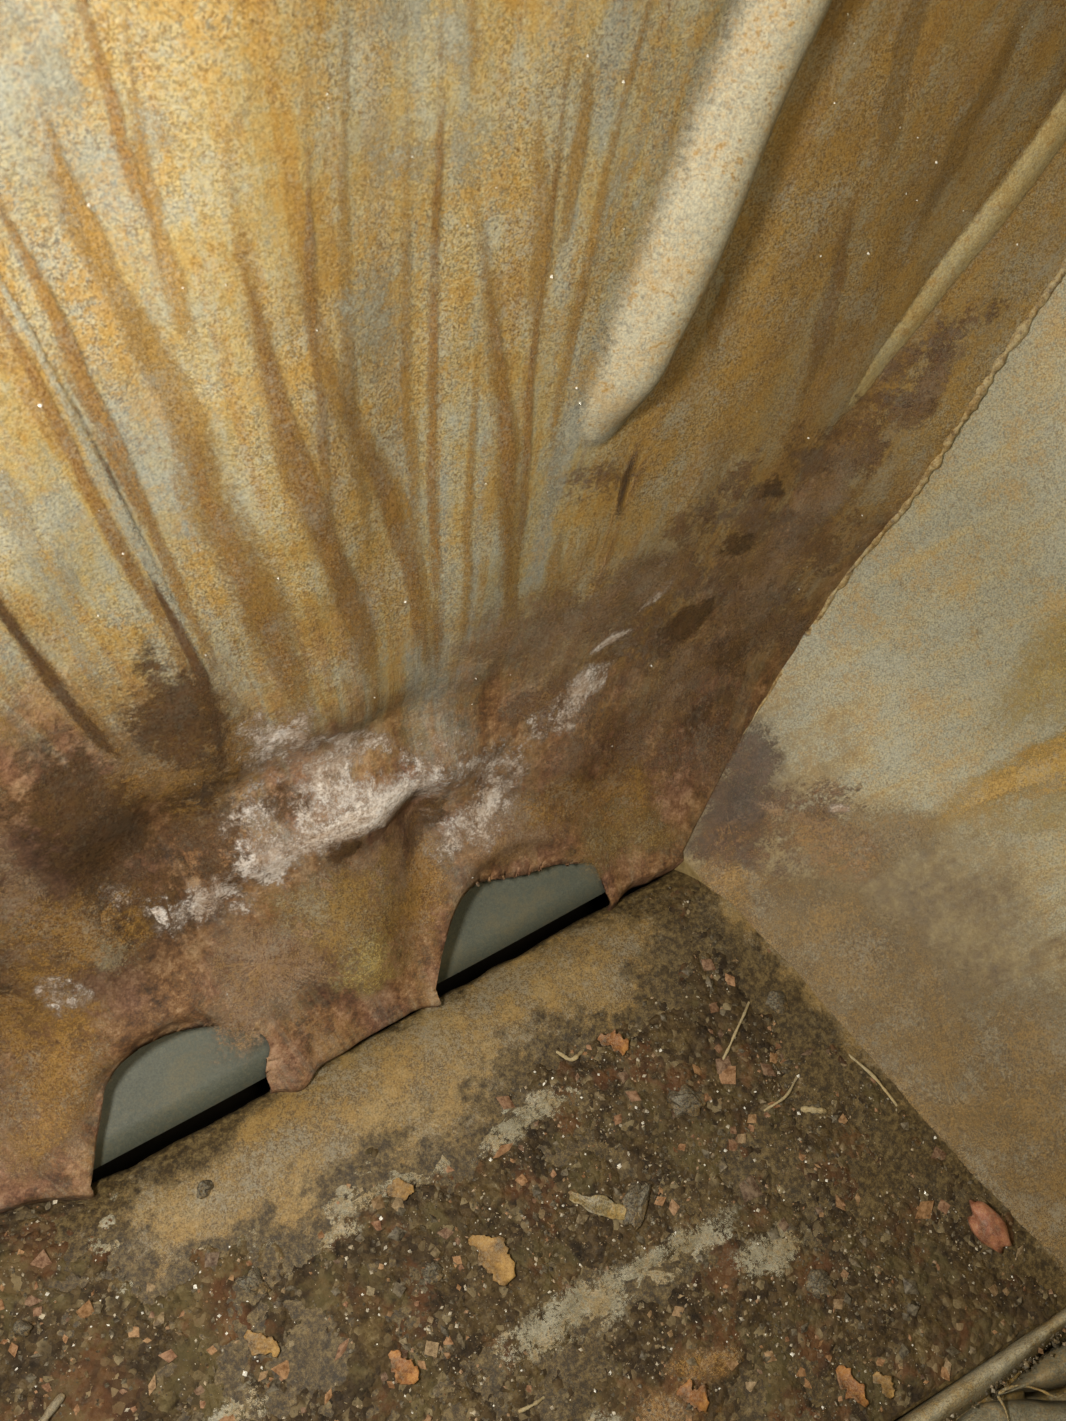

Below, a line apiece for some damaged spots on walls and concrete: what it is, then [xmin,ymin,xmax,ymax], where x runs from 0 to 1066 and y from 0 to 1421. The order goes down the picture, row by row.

rust [551,12,648,450]
rust [387,1177,414,1201]